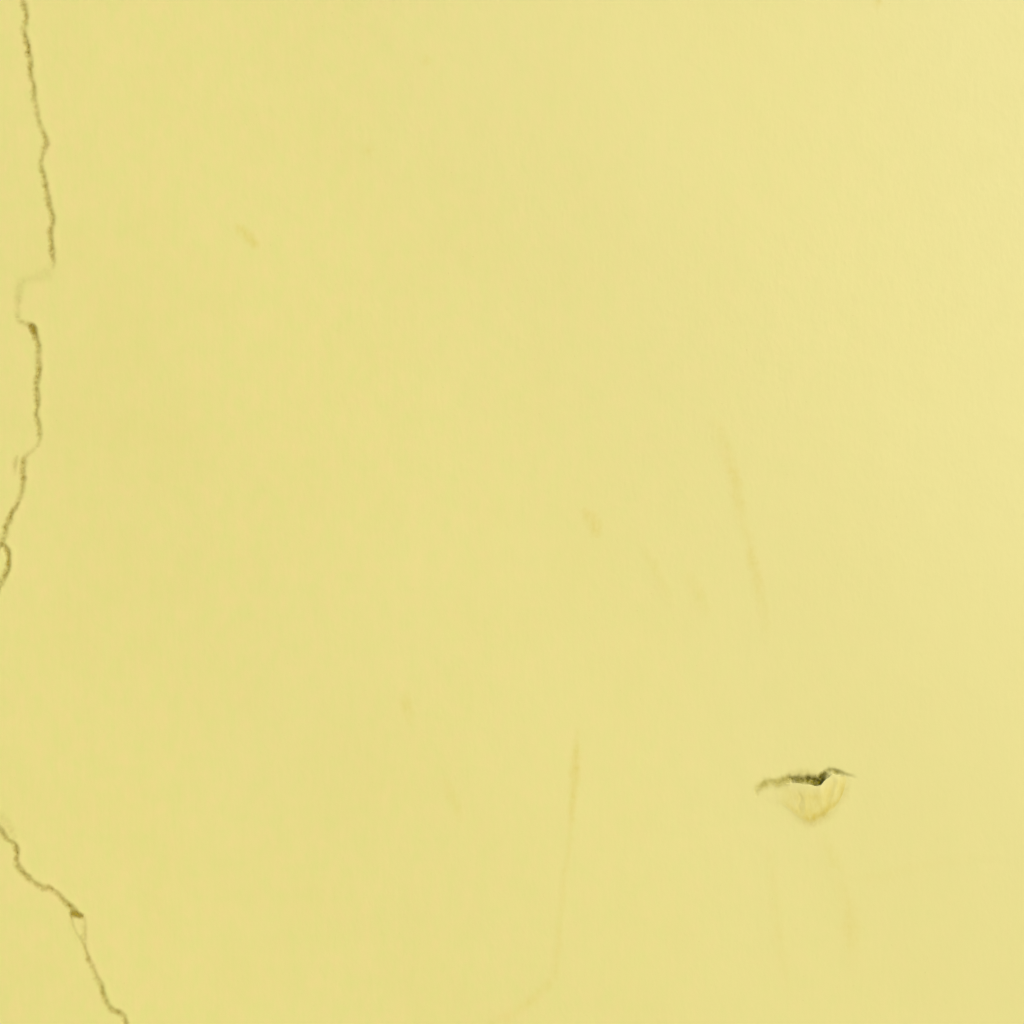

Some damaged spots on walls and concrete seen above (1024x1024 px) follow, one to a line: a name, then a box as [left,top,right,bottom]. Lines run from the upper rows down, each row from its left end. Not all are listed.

peeling [776,771,847,823]